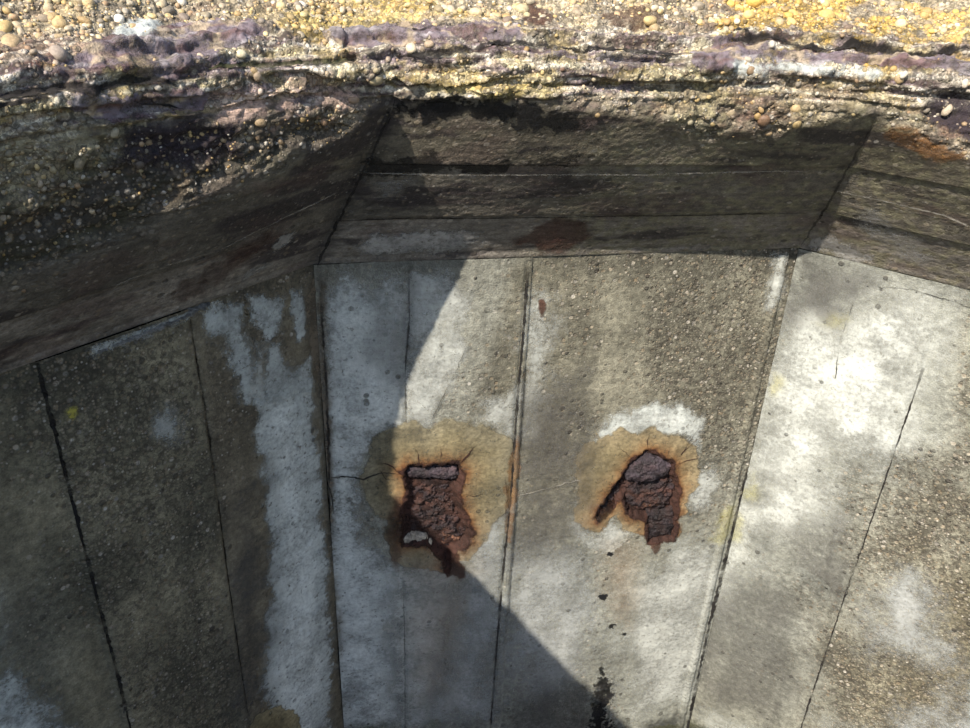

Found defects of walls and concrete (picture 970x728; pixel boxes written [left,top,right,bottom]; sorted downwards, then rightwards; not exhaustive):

spalling [0,0,970,277]
leakage [386,92,592,136]
corrosion [517,219,589,253]
leakage [236,272,590,728]
corrosion [358,418,519,579]
leakage [571,522,628,554]
corrosion [573,426,700,554]
leakage [586,279,953,728]
leakage [0,675,61,728]
corrosion [250,705,301,728]